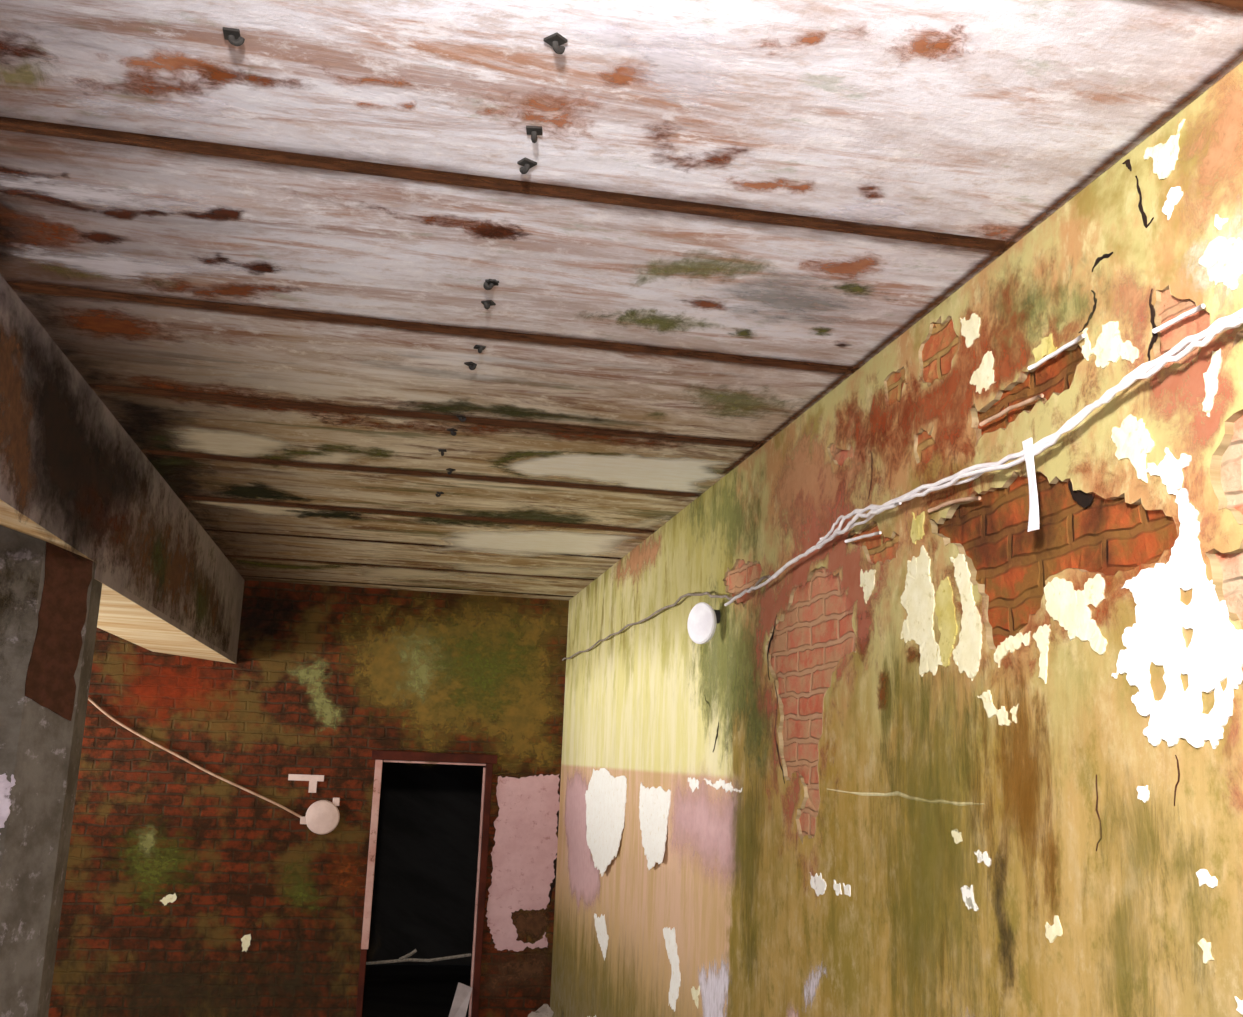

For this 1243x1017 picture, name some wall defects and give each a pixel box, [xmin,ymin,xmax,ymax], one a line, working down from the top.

water stain [0,166,243,258]
crack [1122,159,1154,228]
crack [1078,252,1113,333]
flaking render [970,275,1243,447]
crack [1147,289,1158,362]
water stain [17,328,367,651]
flaking render [765,409,1243,844]
water stain [693,598,771,766]
peeling [340,595,736,961]
peeling [961,885,979,911]
peeling [663,927,700,1012]
water stain [699,961,730,1017]